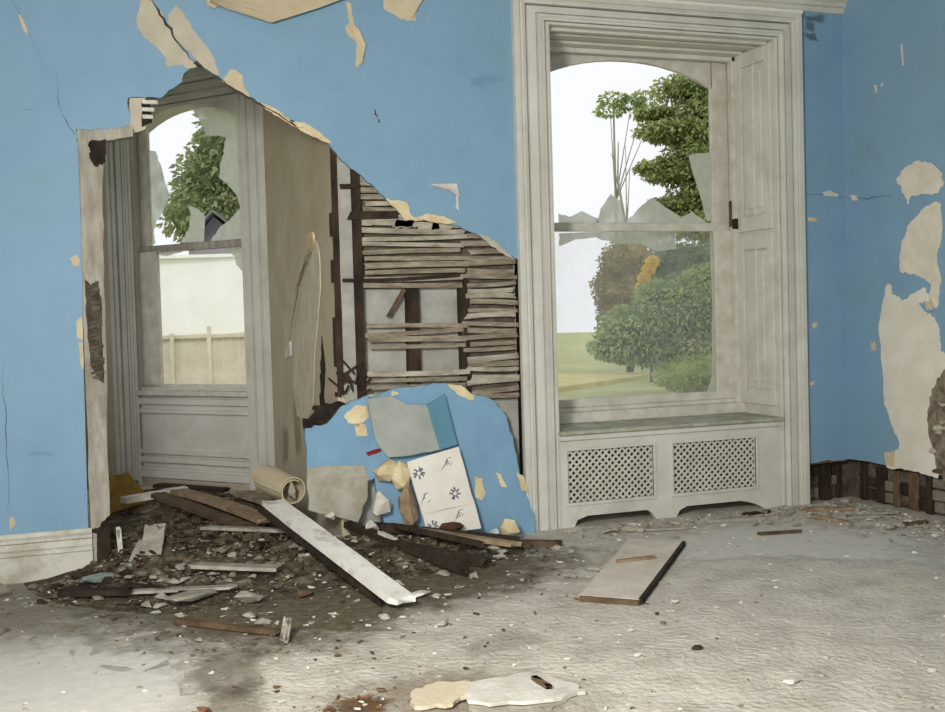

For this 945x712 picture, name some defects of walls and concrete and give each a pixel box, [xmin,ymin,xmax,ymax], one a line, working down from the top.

crack [12,0,75,135]
peeling [136,0,331,143]
peeling [206,0,366,91]
peeling [383,0,422,21]
flaking render [76,278,104,383]
spalling [360,184,516,399]
peeling [871,160,945,481]
flaking render [302,401,346,429]